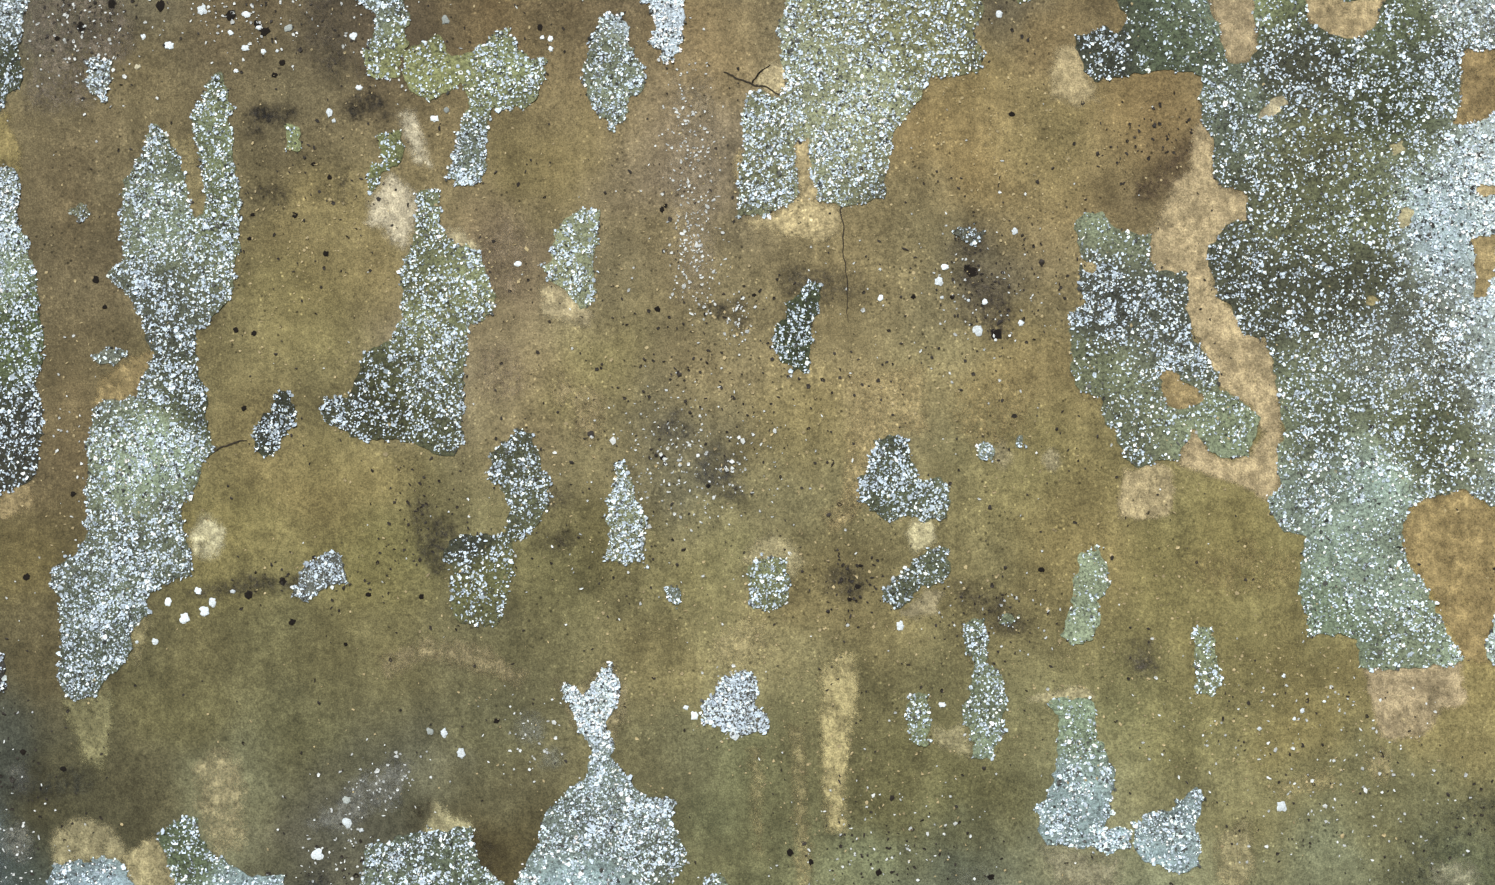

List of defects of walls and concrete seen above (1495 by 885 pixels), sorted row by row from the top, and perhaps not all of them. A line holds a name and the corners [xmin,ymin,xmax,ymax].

peeling [0,0,46,520]
peeling [82,56,113,103]
peeling [49,72,244,770]
peeling [250,389,297,458]
peeling [290,549,348,602]
peeling [319,0,548,456]
peeling [442,428,554,627]
peeling [359,661,687,885]
peeling [735,0,987,242]
peeling [904,613,1020,761]
peeling [1031,687,1207,885]
peeling [1050,0,1495,740]